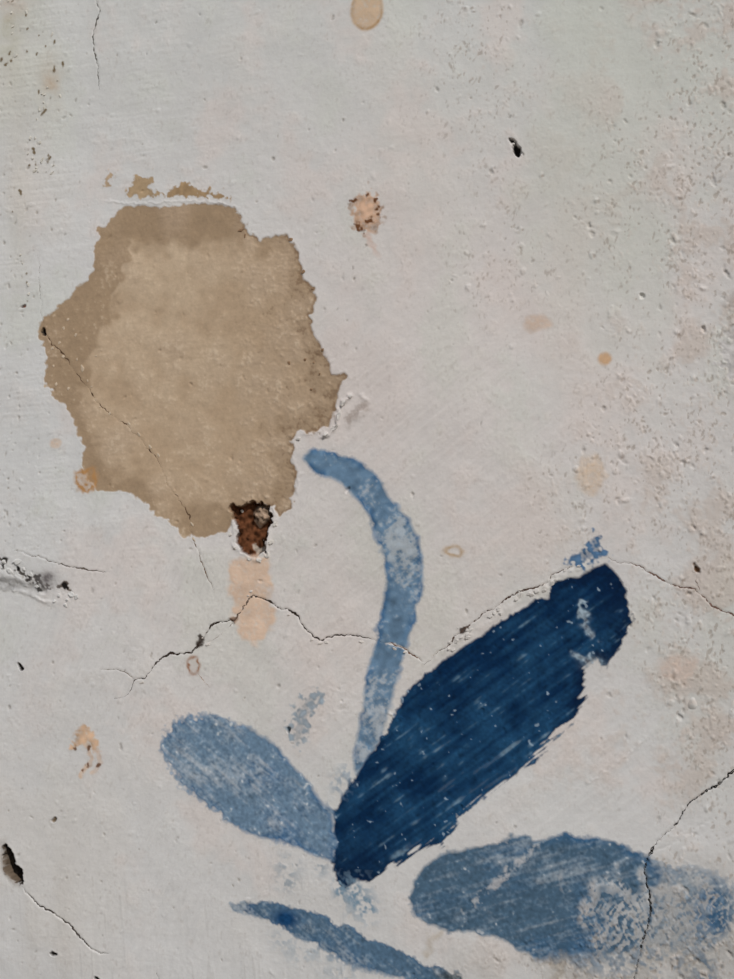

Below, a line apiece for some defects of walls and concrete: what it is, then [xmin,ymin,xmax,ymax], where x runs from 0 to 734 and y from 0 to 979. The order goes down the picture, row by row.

crack [92,4,101,89]
damp [348,0,386,33]
peeling [37,167,372,563]
crack [610,558,734,616]
crack [106,565,581,699]
spalling [0,836,25,889]
crack [634,769,734,979]
crack [23,887,109,954]